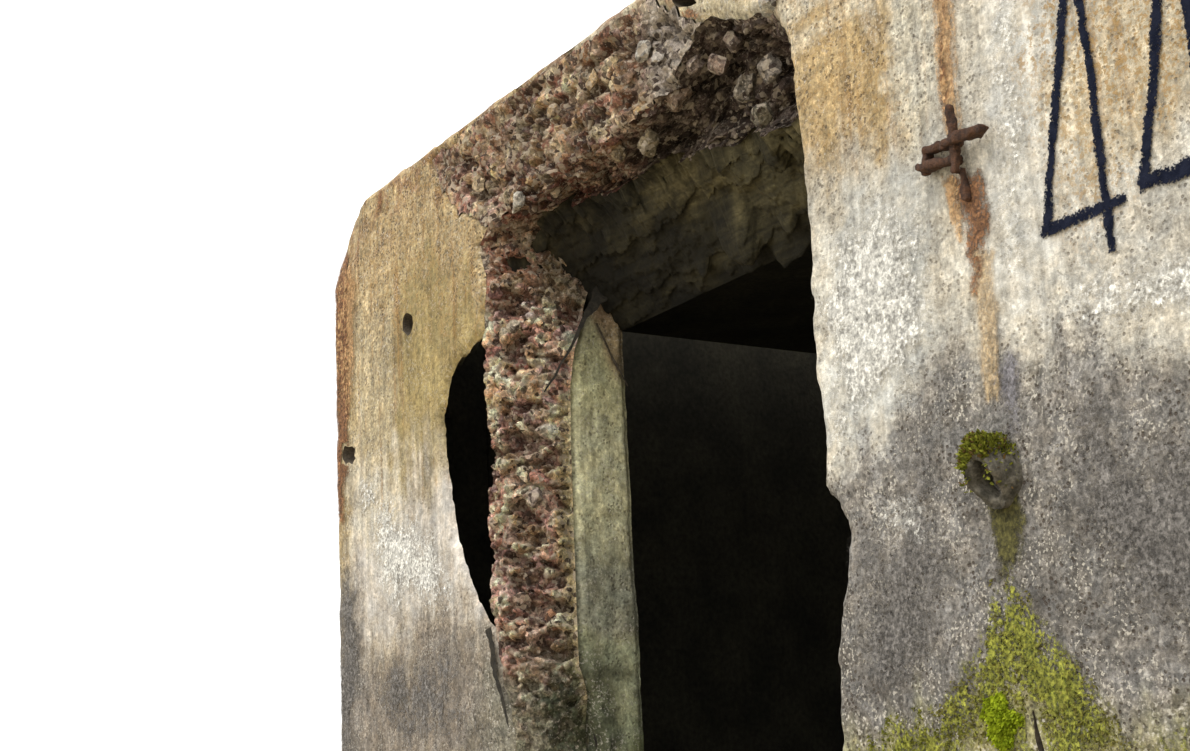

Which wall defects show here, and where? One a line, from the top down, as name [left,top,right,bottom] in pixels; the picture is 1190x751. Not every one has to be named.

spalling [432,0,701,227]
corrosion [335,253,358,524]
crack [1032,710,1044,751]